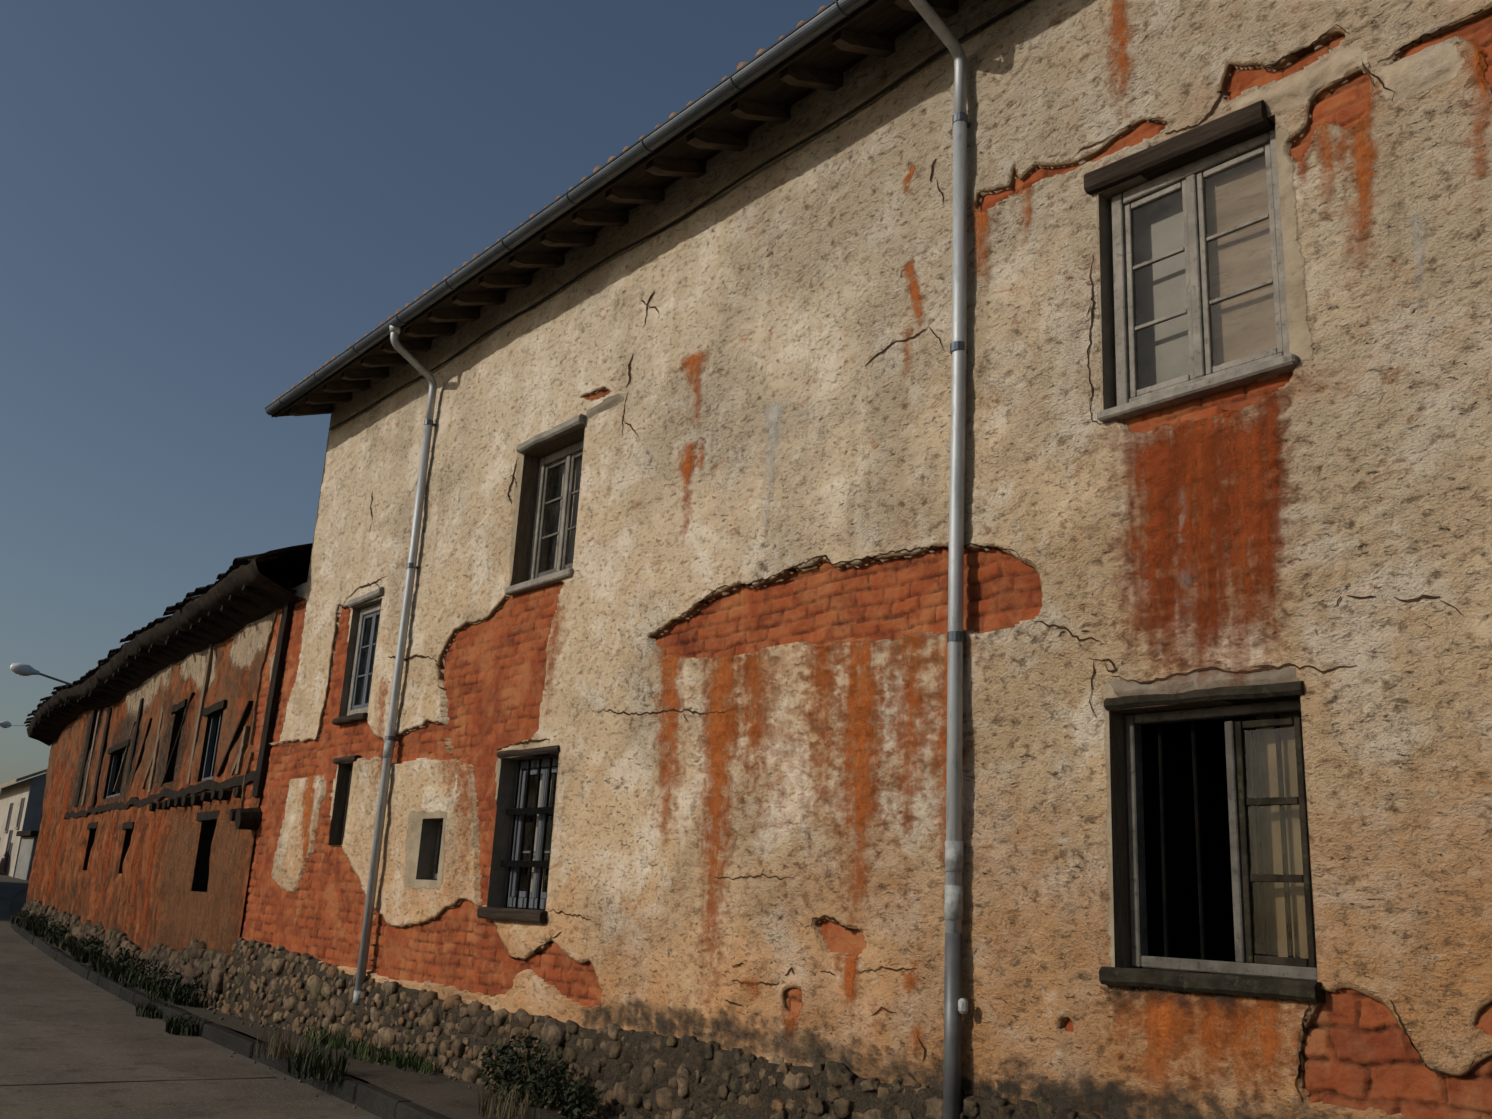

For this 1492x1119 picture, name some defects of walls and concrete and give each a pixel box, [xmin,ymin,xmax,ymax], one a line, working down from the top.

flaking render [1218,28,1346,101]
flaking render [975,117,1167,212]
crack [865,326,944,366]
corrosion [1123,394,1281,651]
flaking render [125,582,602,1007]
crack [595,707,743,722]
corrosion [702,643,764,946]
flaking render [648,543,1043,659]
corrosion [809,633,883,900]
corrosion [898,632,948,836]
crack [1032,620,1357,718]
flaking render [1298,983,1492,1119]